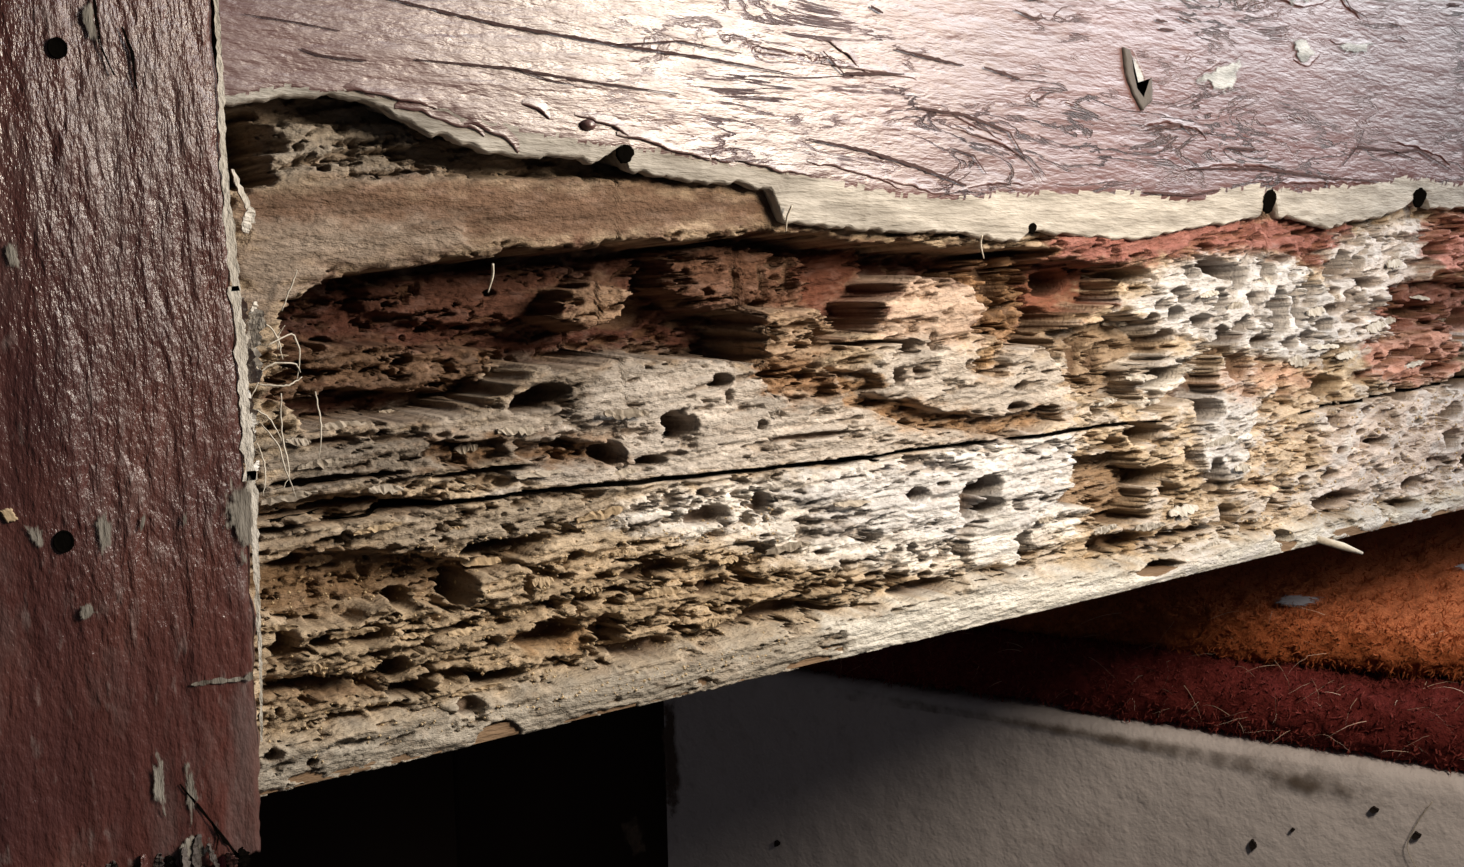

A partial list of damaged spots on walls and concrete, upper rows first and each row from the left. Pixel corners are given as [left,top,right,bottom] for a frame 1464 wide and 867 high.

peeling [809,33,916,80]
peeling [1197,54,1242,94]
peeling [343,79,520,153]
peeling [575,109,1029,196]
crack [1300,376,1464,414]
peeling [215,297,318,566]
peeling [367,484,404,495]
crack [261,421,1162,522]
peeling [1093,504,1199,535]
peeling [460,555,502,567]
peeling [530,558,567,589]
peeling [400,610,528,639]